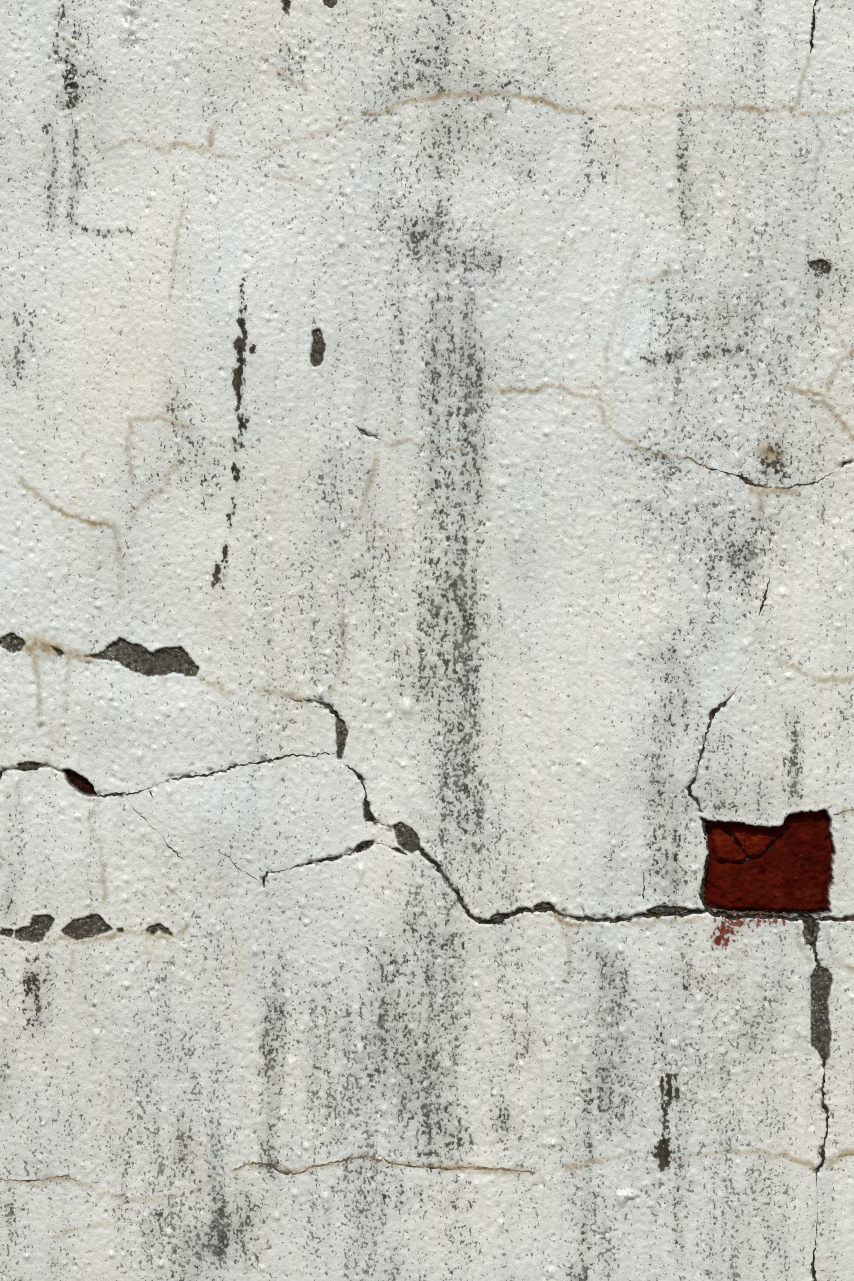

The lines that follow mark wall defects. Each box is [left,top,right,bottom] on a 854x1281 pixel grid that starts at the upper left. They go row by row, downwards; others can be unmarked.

spalling [311,329,326,366]
spalling [0,633,25,653]
spalling [91,638,199,676]
damp [106,0,557,1281]
crack [687,658,751,819]
crack [0,698,705,925]
spalling [699,810,833,945]
spalling [2,914,123,942]
spalling [146,924,172,935]
crack [808,916,854,1281]
crack [0,1174,81,1182]
crack [233,1156,535,1187]